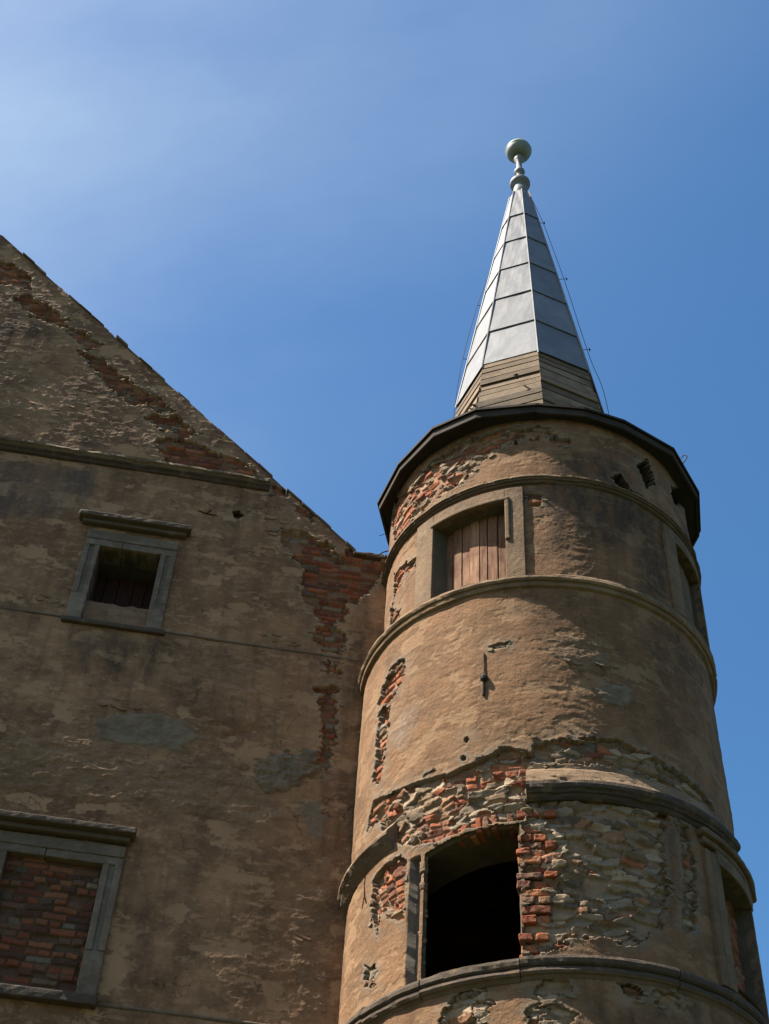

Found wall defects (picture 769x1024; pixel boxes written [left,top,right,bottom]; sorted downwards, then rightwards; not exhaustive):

spalling [0,262,256,477]
spalling [392,424,554,539]
spalling [269,487,416,778]
spalling [368,661,713,956]
spalling [440,988,496,1024]
spalling [526,1001,578,1024]